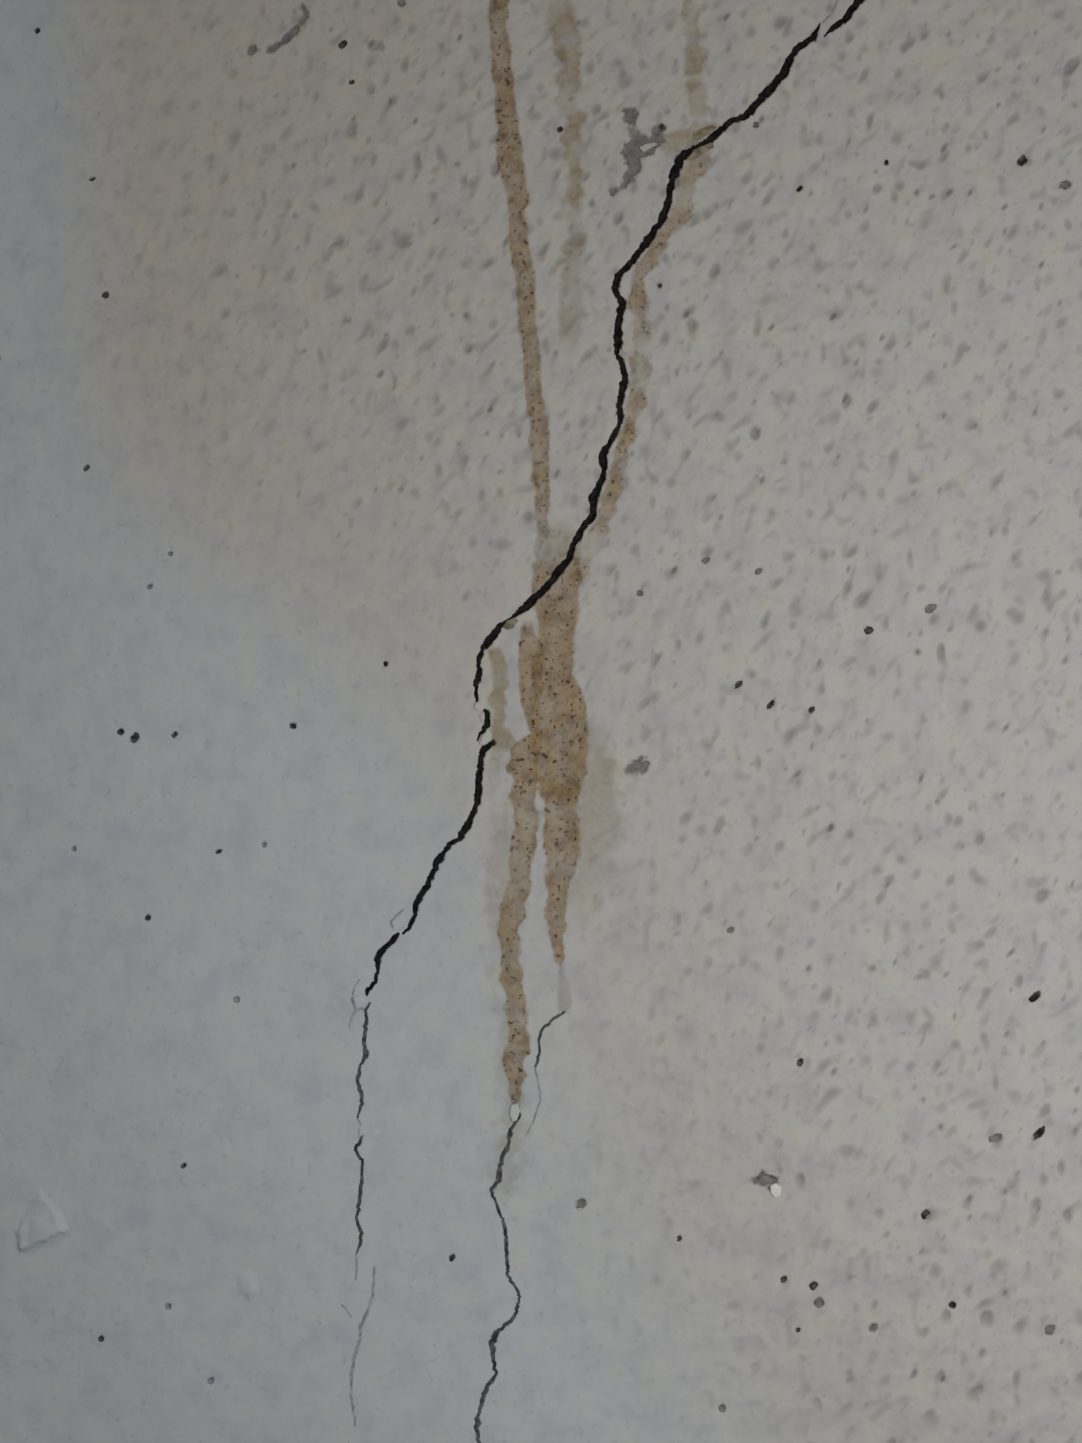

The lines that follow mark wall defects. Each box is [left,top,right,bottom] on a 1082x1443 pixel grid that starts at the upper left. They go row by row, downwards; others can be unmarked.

corrosion [490,0,549,511]
corrosion [615,424,634,453]
corrosion [490,564,588,1102]
crack [341,0,864,1443]